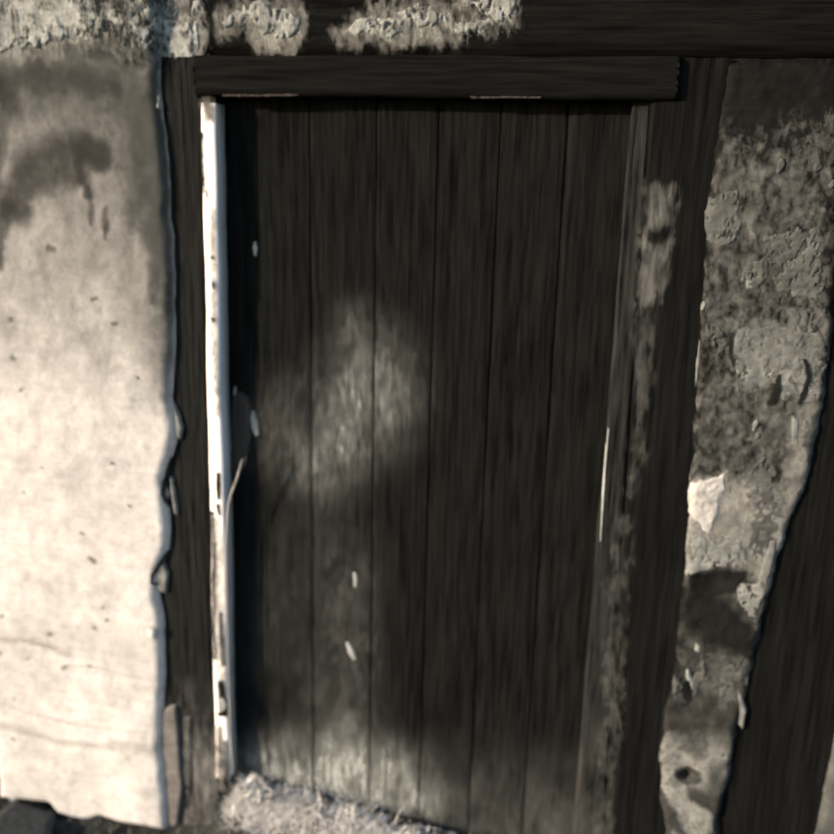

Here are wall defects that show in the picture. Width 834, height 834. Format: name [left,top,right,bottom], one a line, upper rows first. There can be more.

peeling [0,0,205,65]
peeling [216,0,304,56]
leakage [0,21,172,375]
peeling [685,158,829,645]
peeling [659,622,754,834]